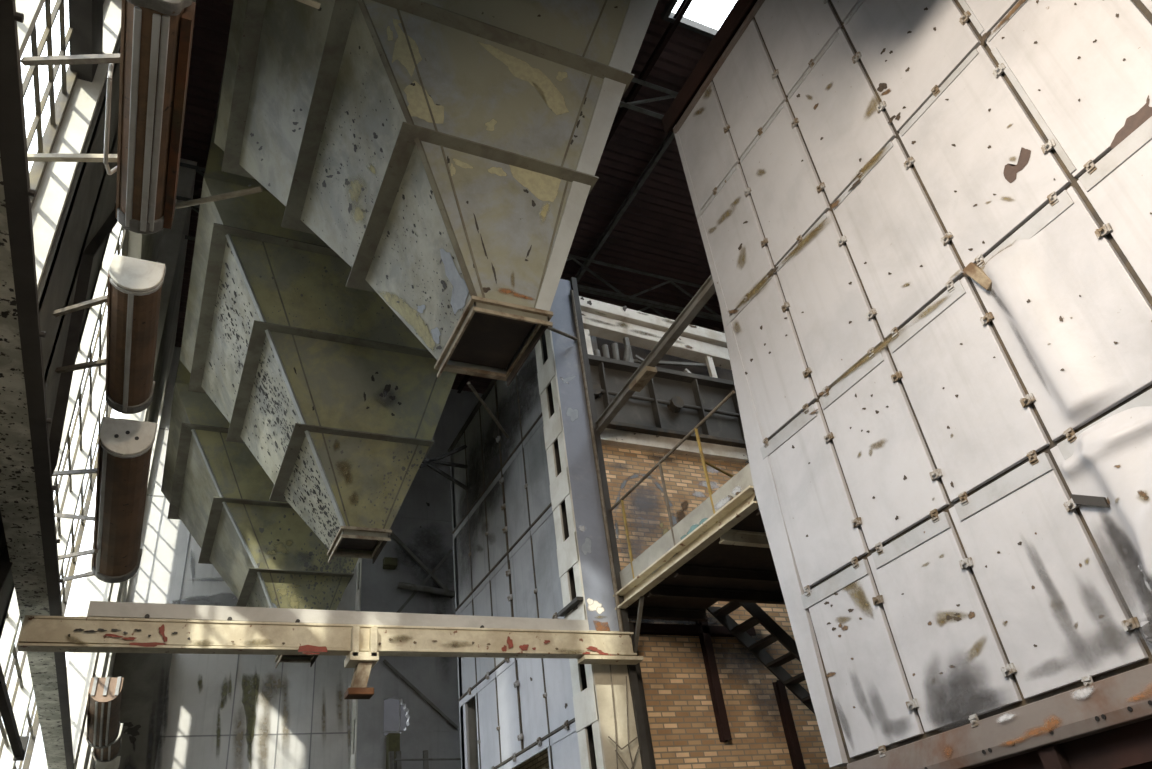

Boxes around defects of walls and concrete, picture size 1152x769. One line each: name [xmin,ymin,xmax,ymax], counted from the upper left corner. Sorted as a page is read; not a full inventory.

peeling [1110,95,1152,148]
peeling [488,165,561,219]
peeling [1003,147,1031,183]
peeling [374,187,475,351]
peeling [466,201,497,284]
damp [217,674,288,767]
rust [1004,716,1060,745]